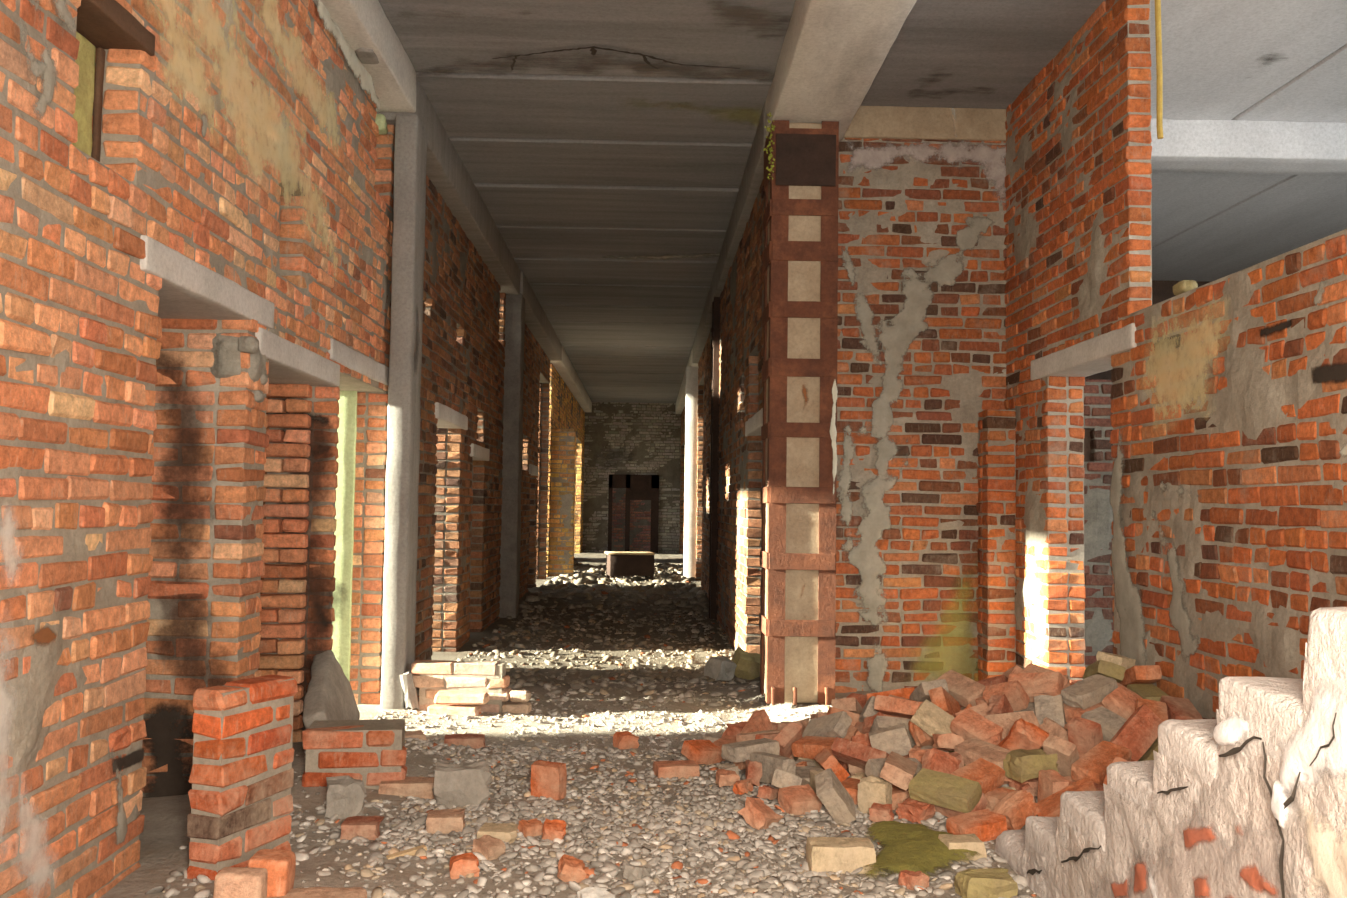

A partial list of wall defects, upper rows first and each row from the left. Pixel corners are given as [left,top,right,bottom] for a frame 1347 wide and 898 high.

spalling [355,48,379,64]
crack [492,46,740,70]
spalling [1312,363,1347,383]
water stain [1,511,18,573]
water stain [0,667,51,888]
crack [1157,786,1188,795]
flaking render [1092,681,1347,898]
crack [1218,713,1337,898]
crack [1027,845,1101,875]